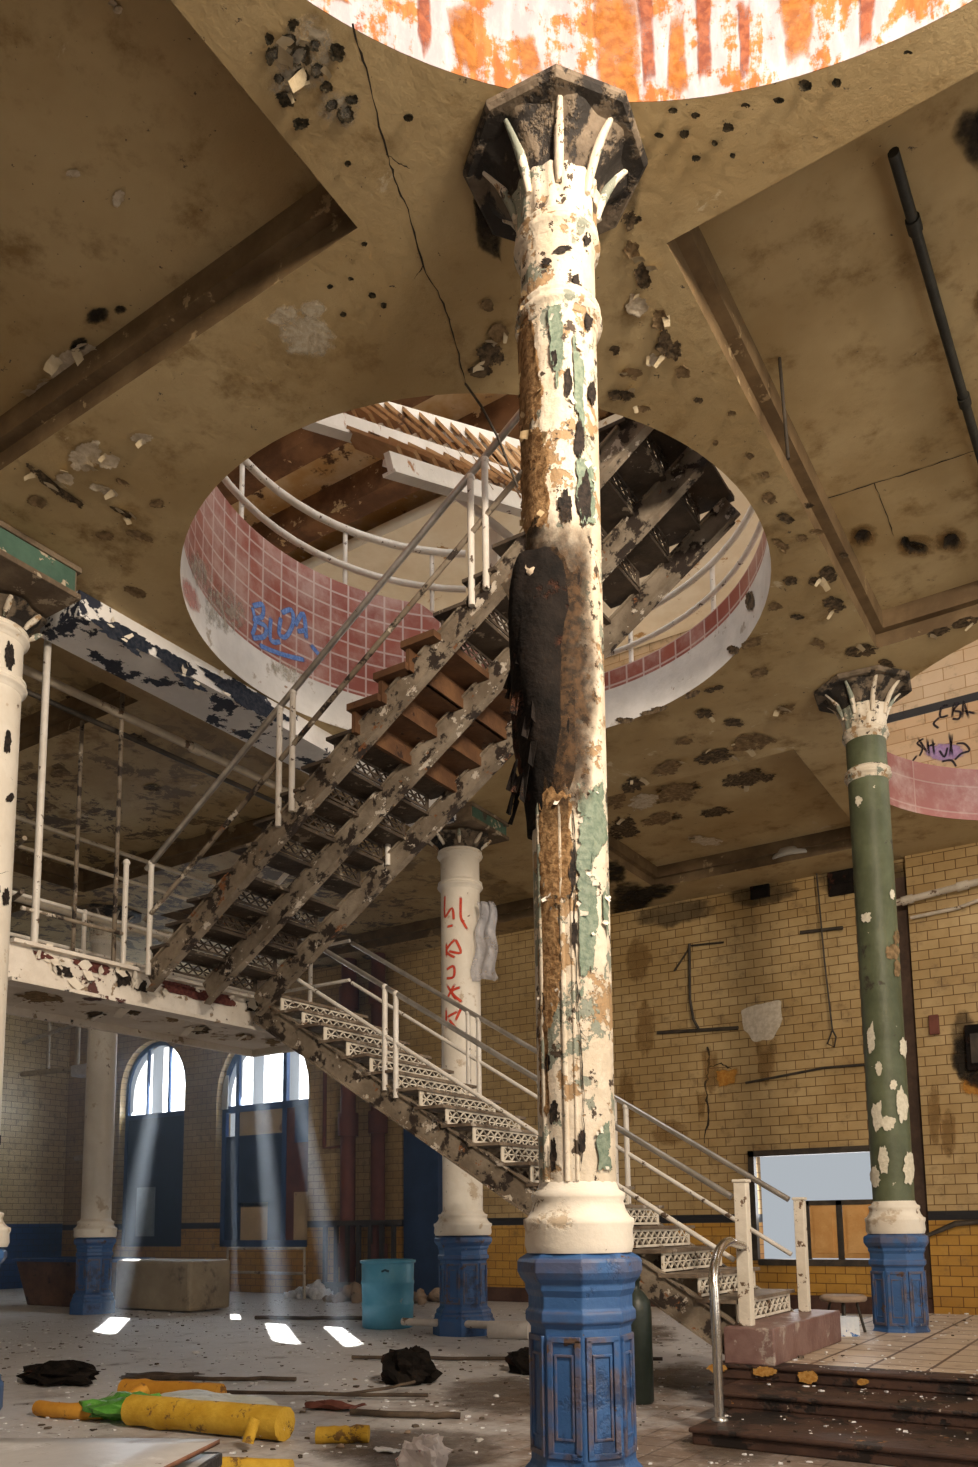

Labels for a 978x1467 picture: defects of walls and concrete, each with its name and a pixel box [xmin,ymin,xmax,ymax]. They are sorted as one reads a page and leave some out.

flaking render [265,18,358,131]
flaking render [654,107,700,139]
crack [352,23,465,379]
peeling [20,306,126,397]
peeling [468,210,690,534]
peeling [4,640,15,671]
peeling [91,617,290,722]
peeling [4,730,12,753]
peeling [6,793,60,817]
peeling [2,887,10,905]
peeling [537,685,782,1172]
peeling [867,1021,915,1188]